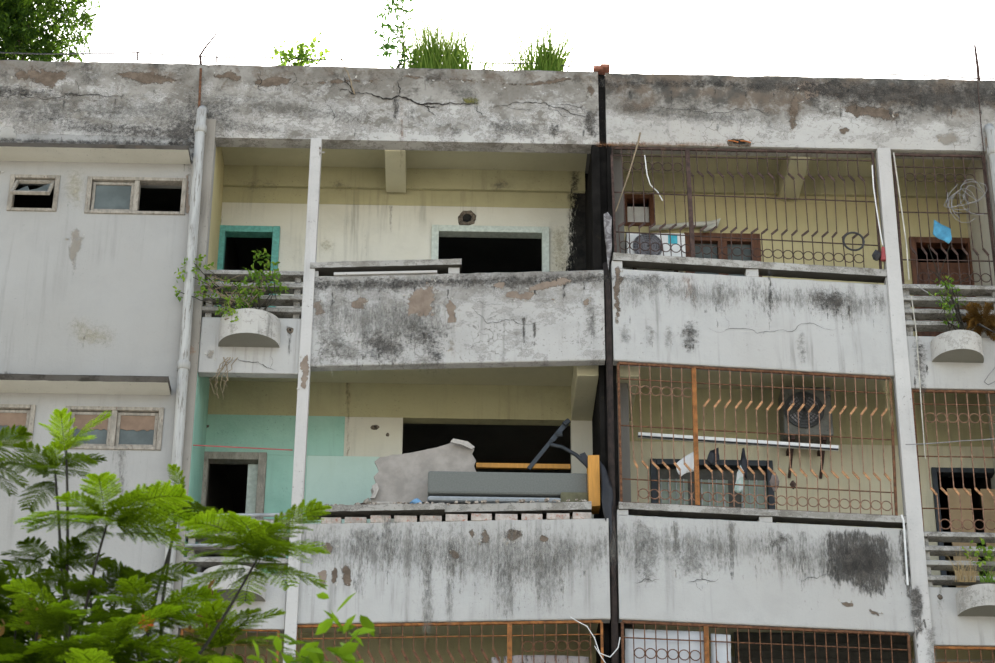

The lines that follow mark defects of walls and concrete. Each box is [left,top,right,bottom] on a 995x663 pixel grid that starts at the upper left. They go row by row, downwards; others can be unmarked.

flaking render [11,65,66,92]
flaking render [114,71,176,84]
crack [325,76,597,125]
water stain [600,78,995,120]
peeling [403,278,456,323]
water stain [314,273,625,366]
water stain [763,270,883,317]
flaking render [469,529,490,545]
flaking render [503,529,522,545]
flaking render [318,565,352,586]
water stain [348,519,615,628]
water stain [772,530,935,661]